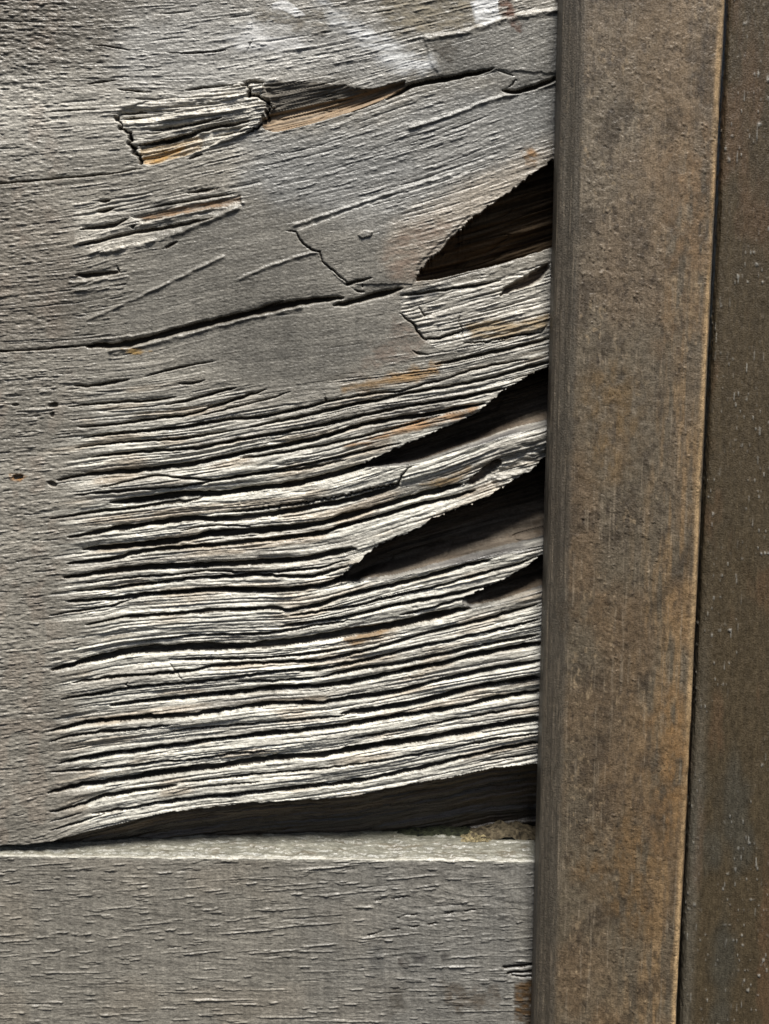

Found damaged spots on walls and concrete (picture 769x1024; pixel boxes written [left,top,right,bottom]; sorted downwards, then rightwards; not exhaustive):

crack [88,80,150,93]
crack [185,84,233,92]
crack [386,68,556,100]
crack [0,230,549,831]